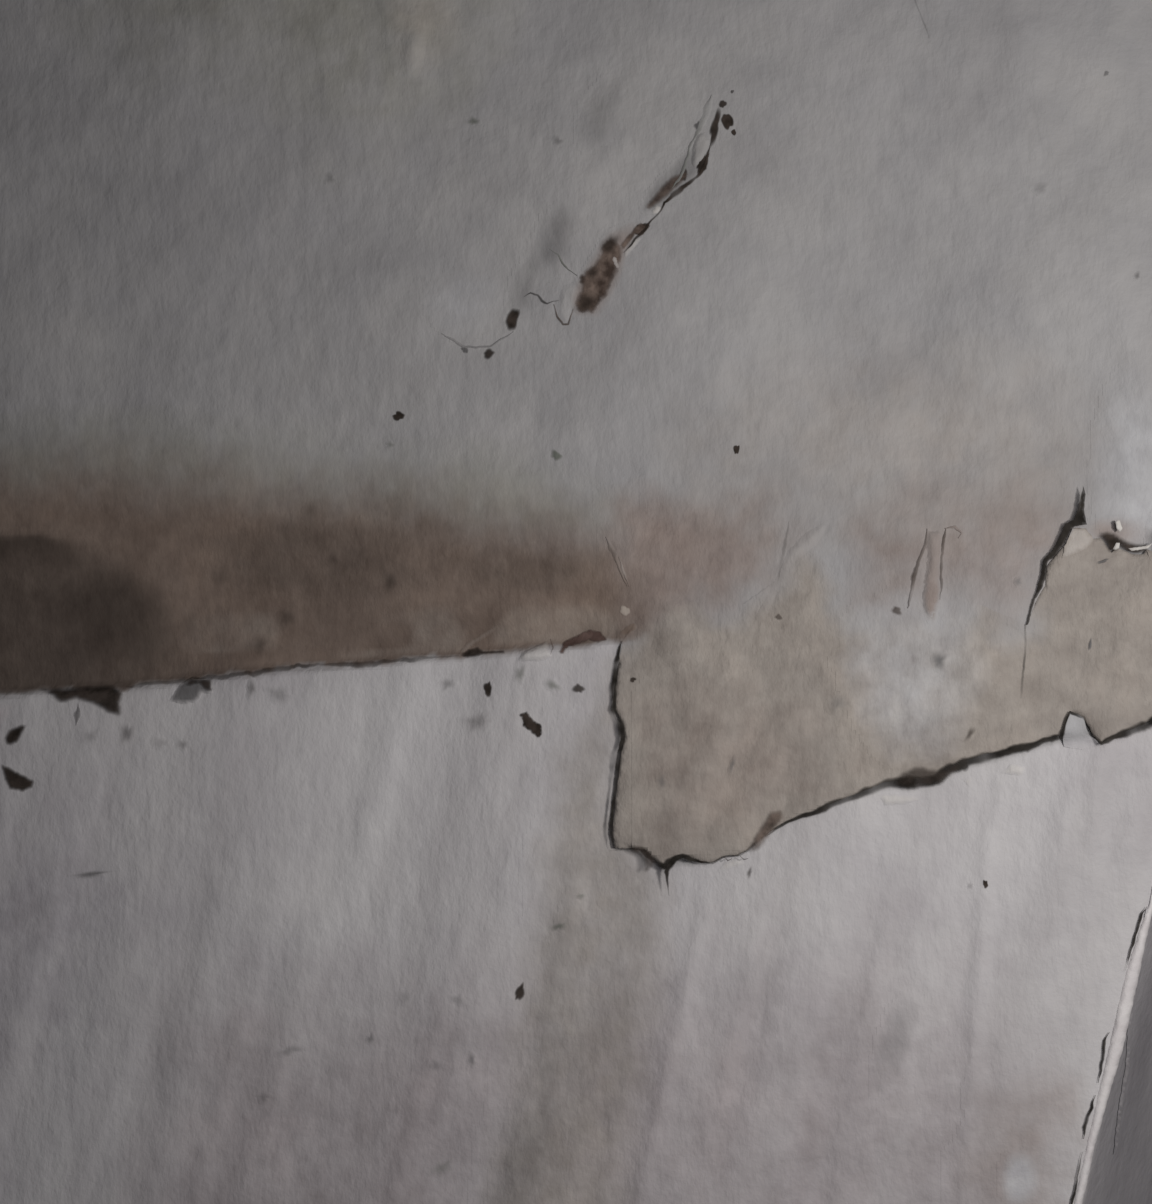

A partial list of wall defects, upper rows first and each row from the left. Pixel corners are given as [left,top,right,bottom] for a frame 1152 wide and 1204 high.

spalling [458,625,503,657]
spalling [512,630,606,685]
peeling [456,682,496,735]
peeling [520,712,542,737]
peeling [542,677,584,692]
water stain [0,295,1152,1204]
peeling [613,519,1152,864]